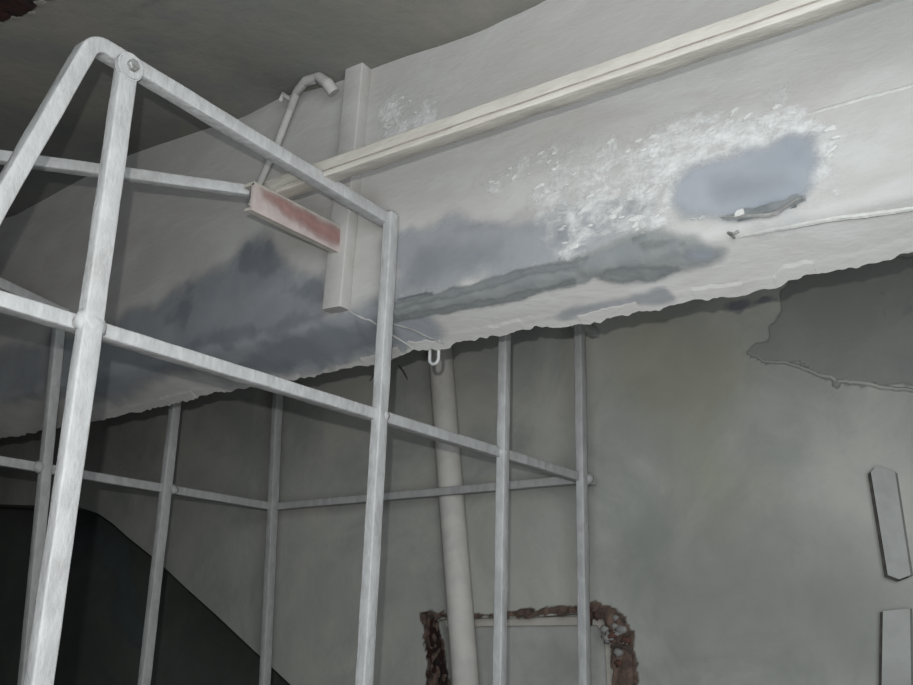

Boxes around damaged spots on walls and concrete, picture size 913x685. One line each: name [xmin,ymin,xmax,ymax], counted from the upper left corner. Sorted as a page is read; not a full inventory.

water stain [397,85,842,291]
spalling [720,195,803,220]
water stain [116,244,378,370]
water stain [392,316,438,347]
flaking render [391,236,913,393]
water stain [0,342,51,396]
water stain [60,339,74,396]
water stain [94,342,190,397]
flaking render [270,353,375,381]
flaking render [90,380,255,422]
flaking render [0,423,43,439]